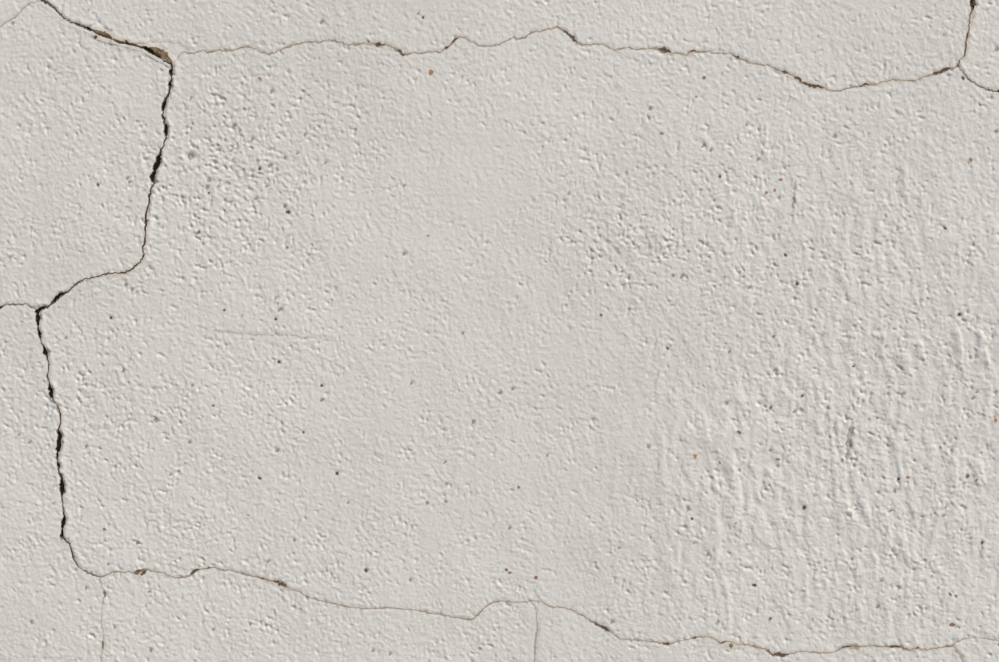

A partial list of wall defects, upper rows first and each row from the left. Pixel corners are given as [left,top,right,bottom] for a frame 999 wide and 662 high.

crack [260,25,924,91]
crack [928,0,999,92]
crack [0,0,390,610]
crack [396,600,999,662]